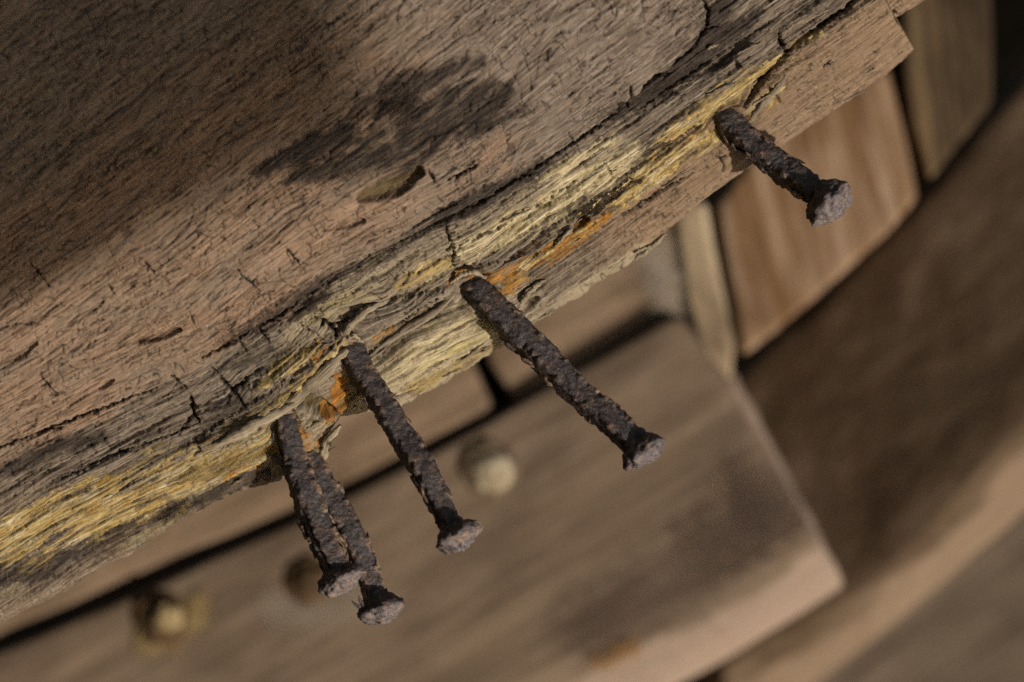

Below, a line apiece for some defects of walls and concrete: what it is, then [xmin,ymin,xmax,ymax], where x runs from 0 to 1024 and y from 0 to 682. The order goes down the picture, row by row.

crack [629,0,853,108]
crack [428,164,476,182]
crack [499,116,610,189]
crack [614,155,726,219]
rust [447,212,612,314]
crack [202,303,348,409]
rust [299,372,352,470]
rust [410,475,433,513]